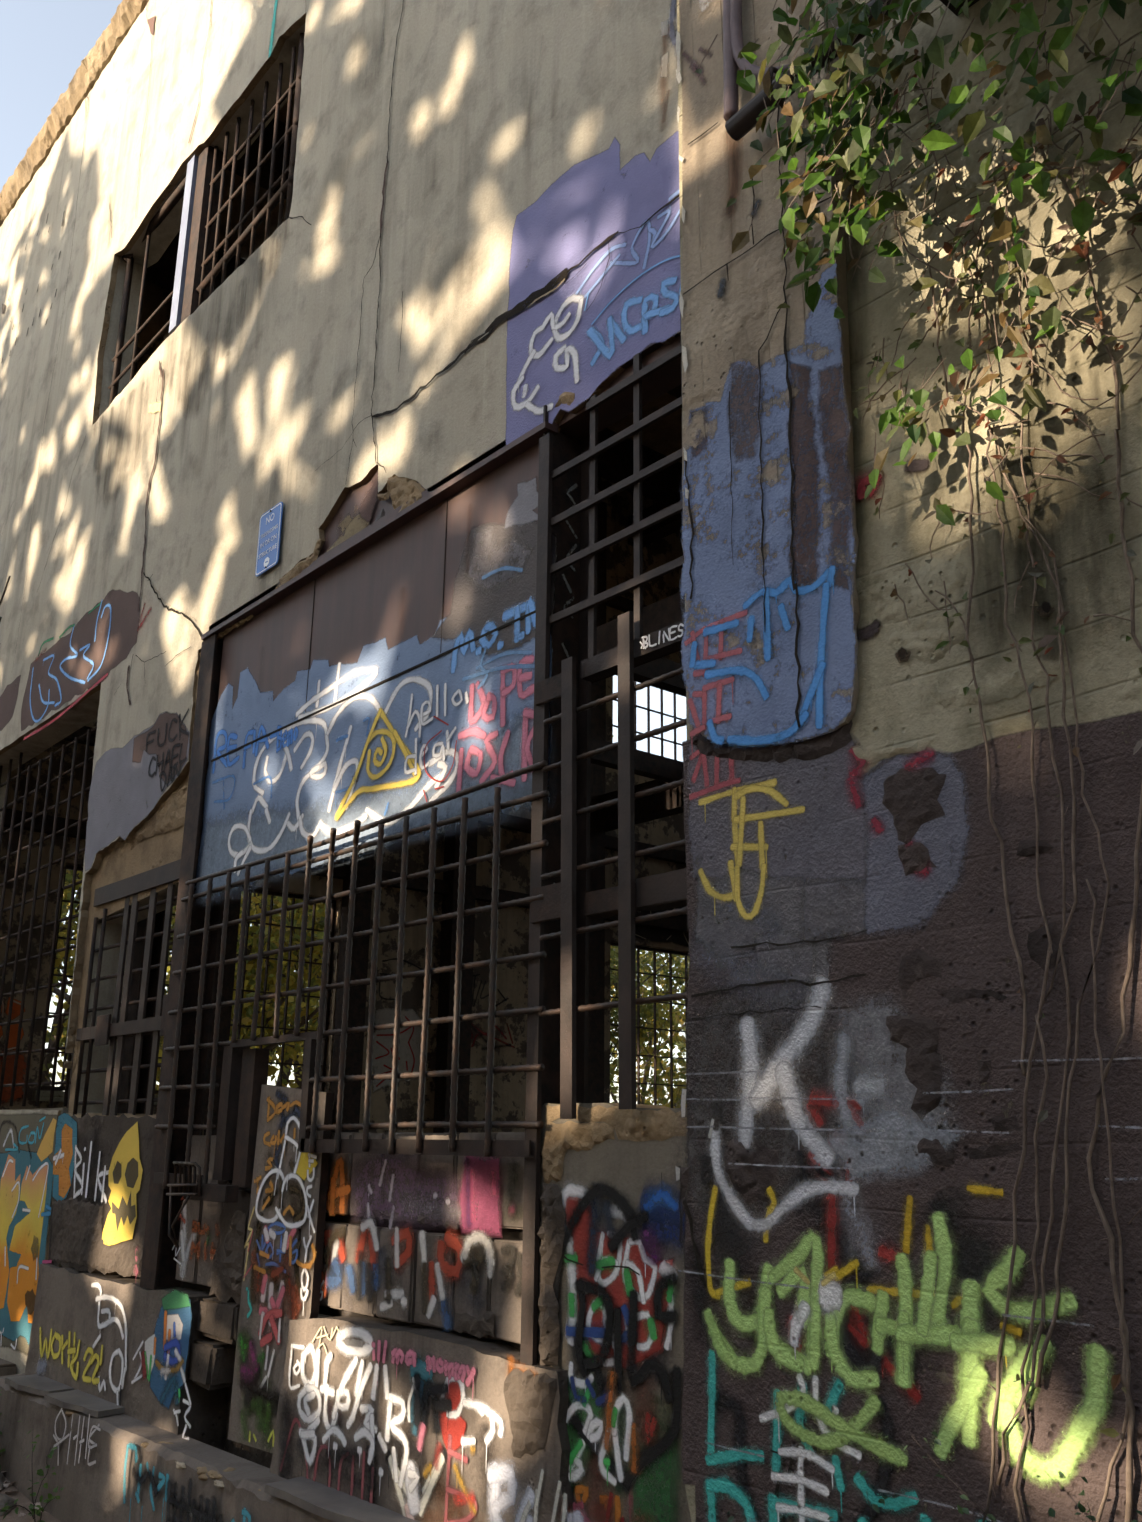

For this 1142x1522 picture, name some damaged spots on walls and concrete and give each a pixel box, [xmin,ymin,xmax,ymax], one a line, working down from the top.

crack [315,0,679,480]
crack [114,361,204,705]
spalling [275,472,425,589]
crack [683,105,831,728]
spalling [690,720,947,876]
spalling [928,654,1084,706]
water stain [987,344,1070,641]